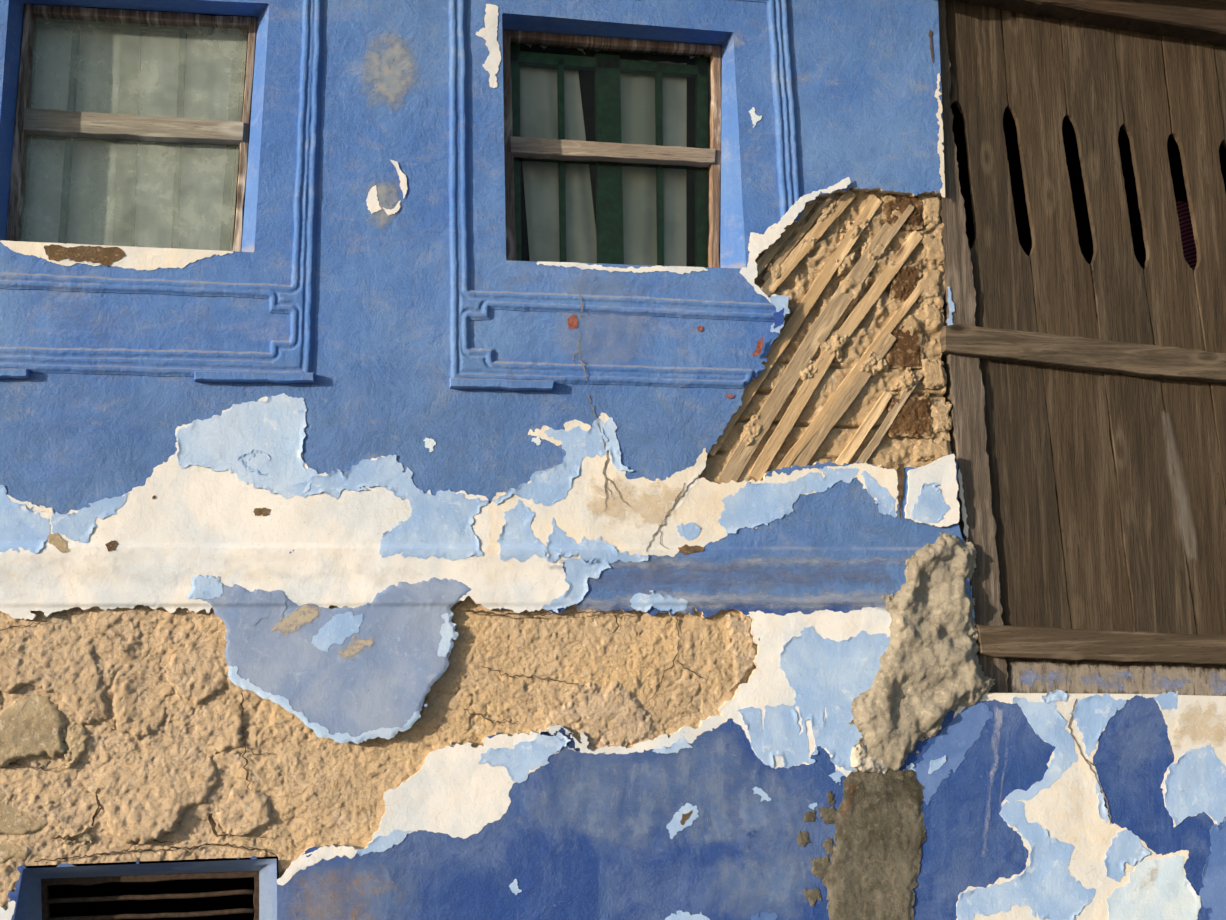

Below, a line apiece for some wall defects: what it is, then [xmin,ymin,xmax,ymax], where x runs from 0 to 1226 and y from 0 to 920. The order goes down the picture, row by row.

peeling [476,4,501,88]
crack [572,292,632,512]
flaking render [0,29,969,920]
crack [646,474,700,552]
crack [8,760,71,771]
crack [34,788,277,862]
crack [240,693,270,790]
crack [464,709,521,725]
crack [481,666,587,687]
peeling [903,669,1226,920]
crack [1068,699,1111,824]